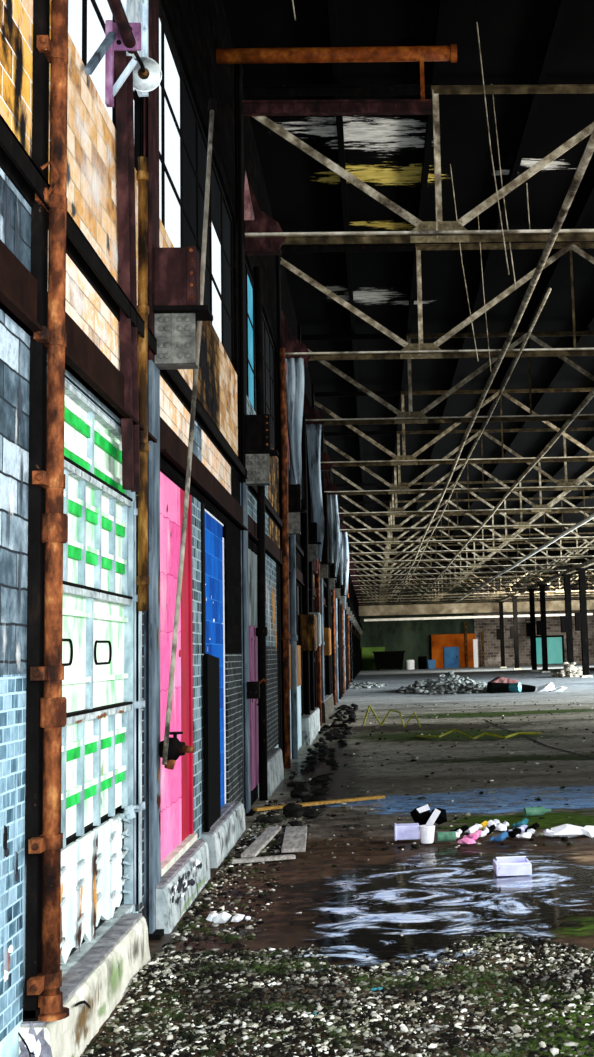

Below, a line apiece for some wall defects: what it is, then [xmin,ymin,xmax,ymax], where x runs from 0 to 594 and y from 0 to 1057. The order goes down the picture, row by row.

water stain [2,0,13,42]
water stain [77,984,110,1044]